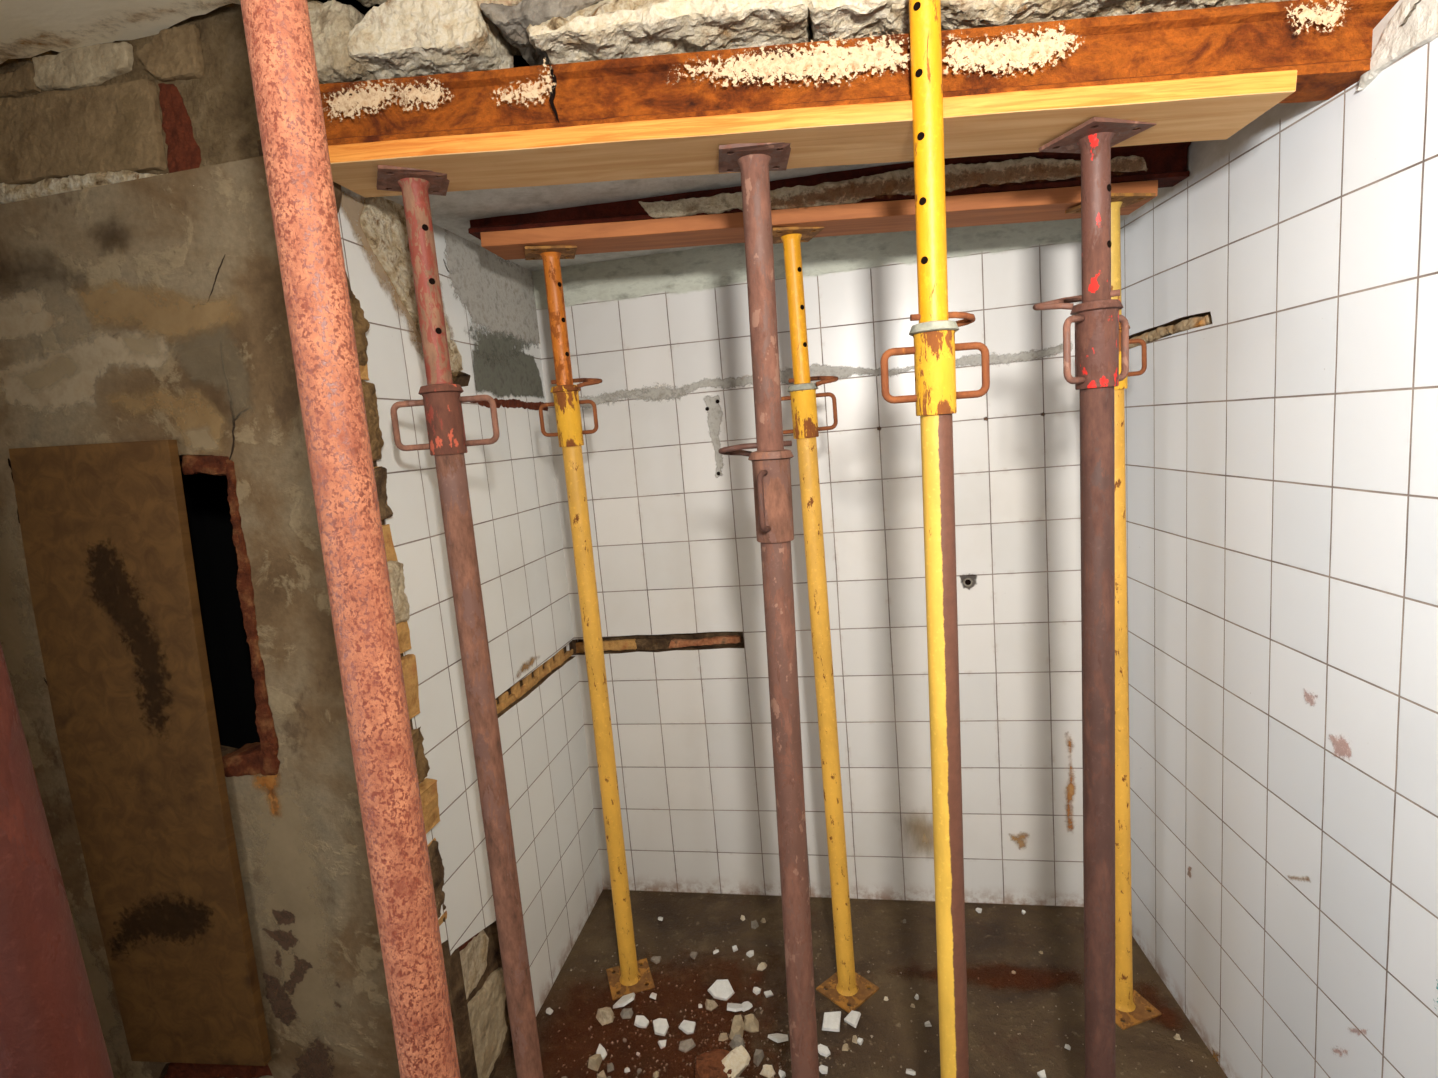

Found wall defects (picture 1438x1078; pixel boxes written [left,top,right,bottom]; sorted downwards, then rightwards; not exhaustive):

peeling [1357,0,1438,91]
spalling [341,191,424,358]
spalling [442,302,463,375]